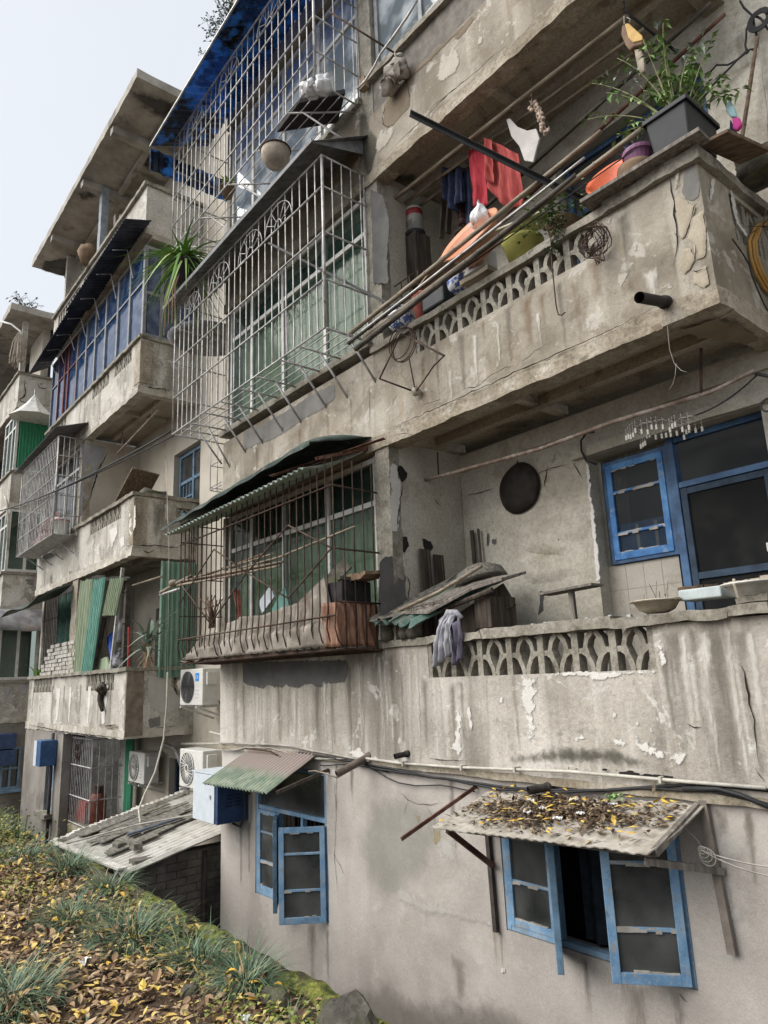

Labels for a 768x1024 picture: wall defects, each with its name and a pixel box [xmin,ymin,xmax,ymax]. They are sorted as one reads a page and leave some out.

peeling [376,12,476,152]
crack [669,178,704,272]
peeling [389,464,409,569]
peeling [555,640,666,680]
peeling [451,707,473,756]
peeling [521,676,538,741]
peeling [613,722,686,765]
crack [742,668,762,778]